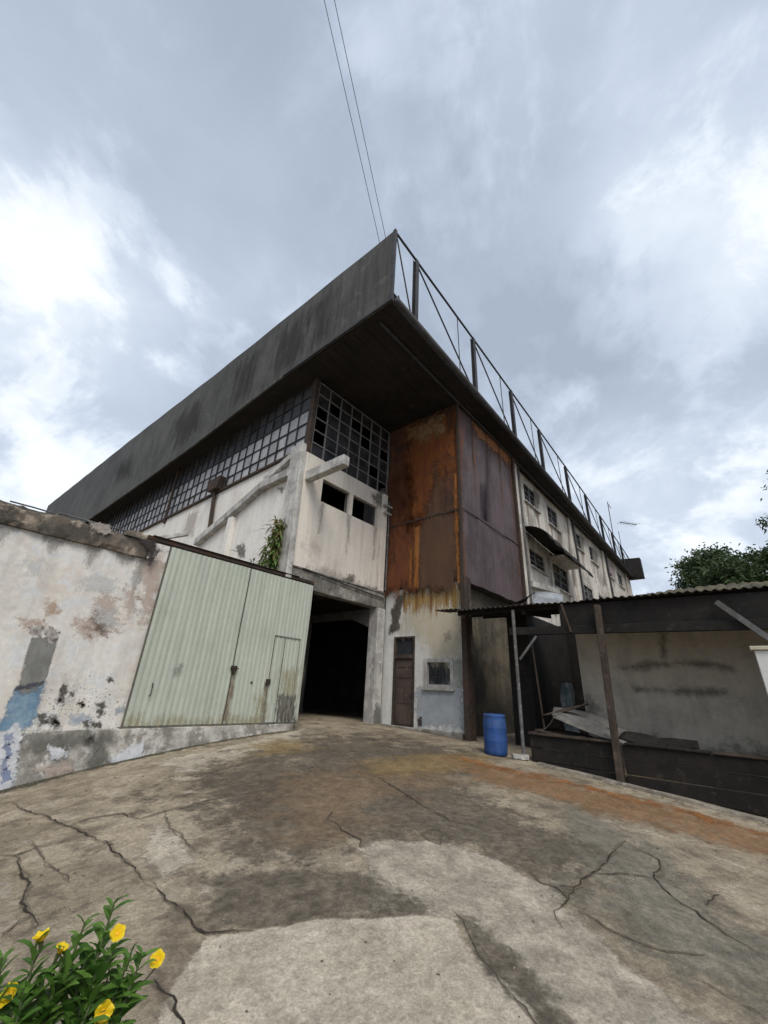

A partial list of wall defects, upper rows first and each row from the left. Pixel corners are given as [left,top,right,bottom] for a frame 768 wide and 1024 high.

spalling [88,520,113,535]
rust [383,412,515,615]
peeling [0,598,61,790]
rust [458,757,768,854]
crack [2,795,235,934]
crack [527,840,765,955]
crack [154,979,185,1024]